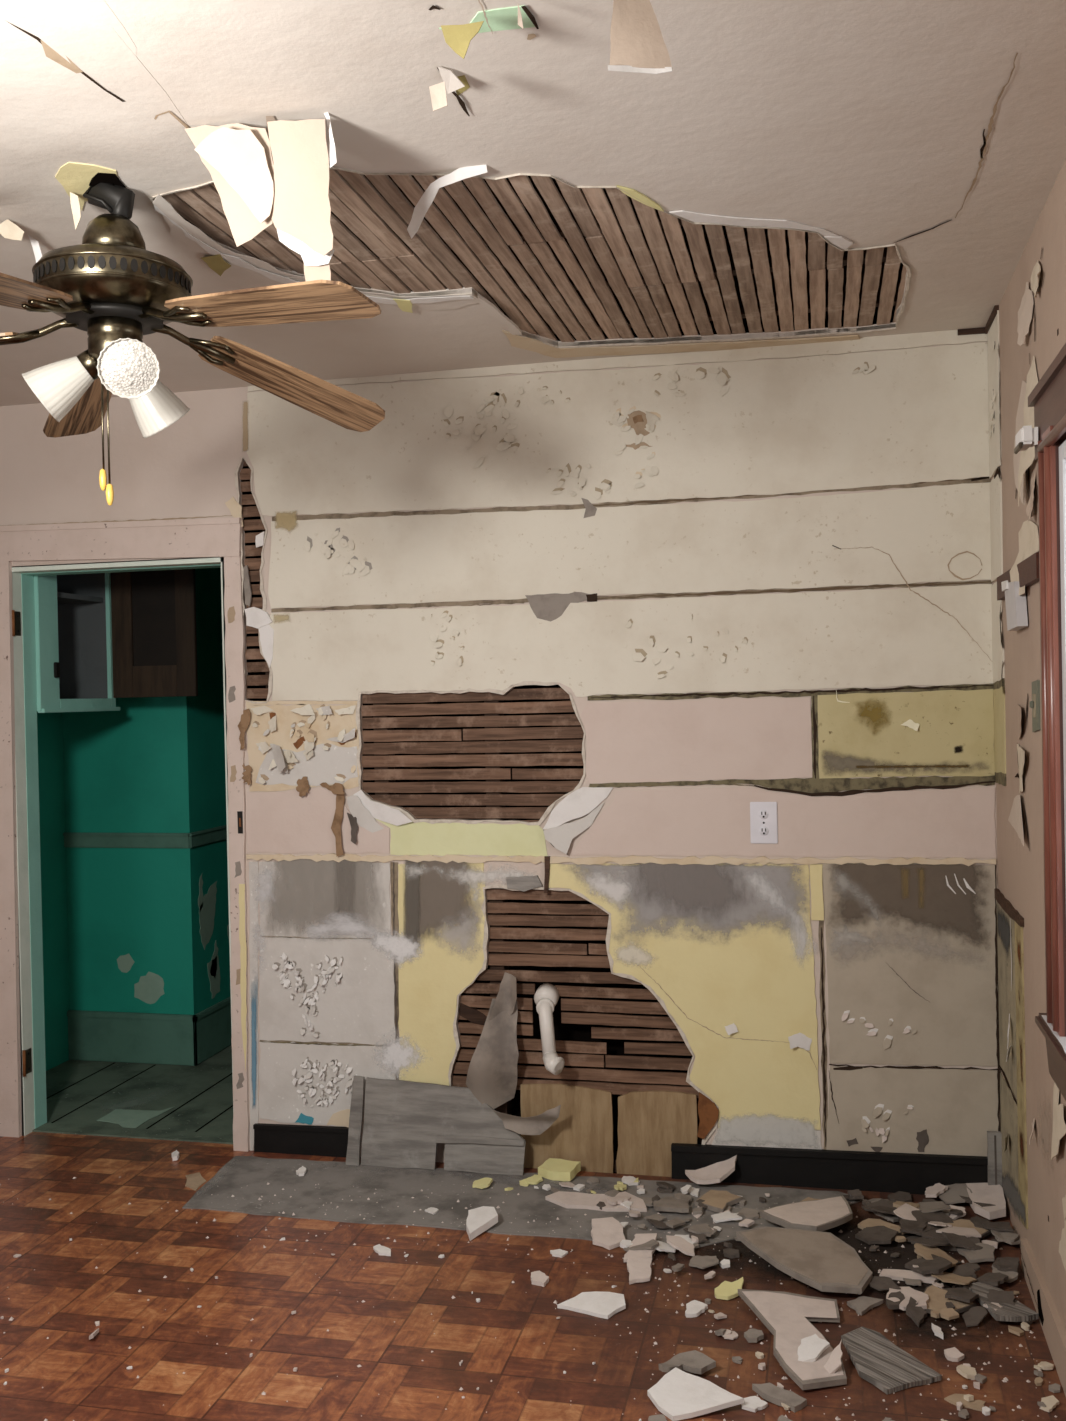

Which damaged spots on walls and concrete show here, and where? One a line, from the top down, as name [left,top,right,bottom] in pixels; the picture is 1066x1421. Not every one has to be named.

crack [0,0,189,128]
peeling [429,4,539,116]
spalling [149,181,305,282]
spalling [329,167,911,488]
spalling [225,456,719,1194]